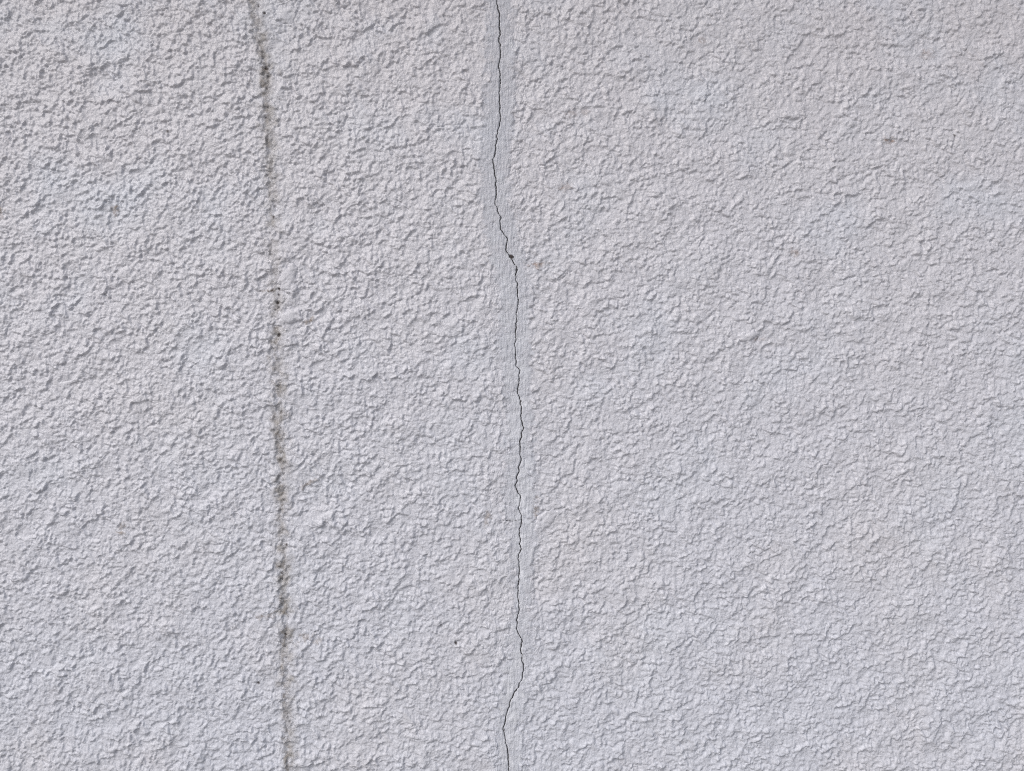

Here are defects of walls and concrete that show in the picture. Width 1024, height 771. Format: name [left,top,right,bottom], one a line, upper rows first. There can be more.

crack [493,5,524,770]